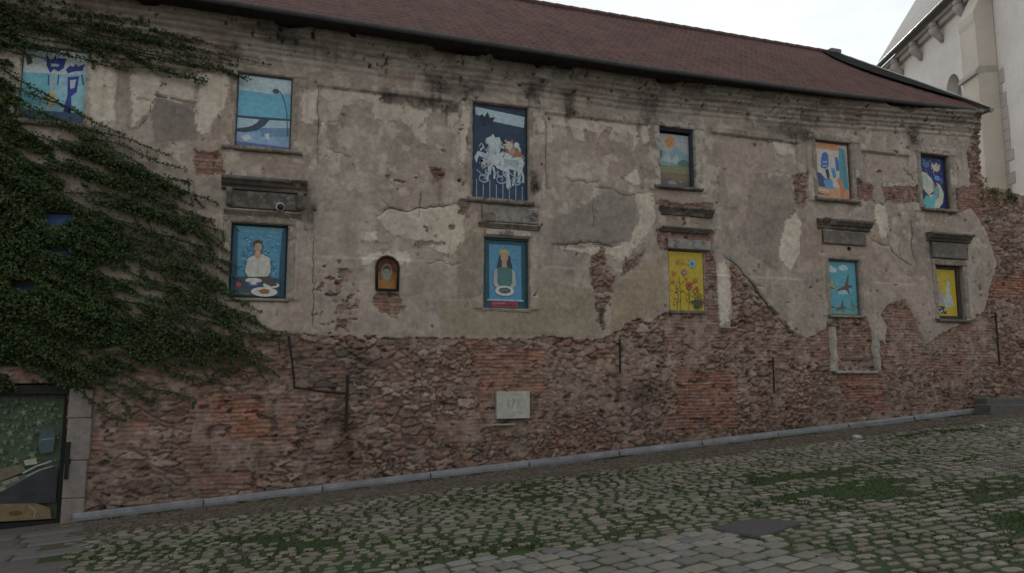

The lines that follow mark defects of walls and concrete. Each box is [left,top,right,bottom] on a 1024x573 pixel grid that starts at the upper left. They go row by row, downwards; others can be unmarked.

spalling [190,147,232,182]
crack [380,196,455,217]
crack [545,121,638,251]
peeling [314,200,470,332]
spalling [558,167,732,333]
spalling [877,268,937,353]
flaking render [839,369,885,412]